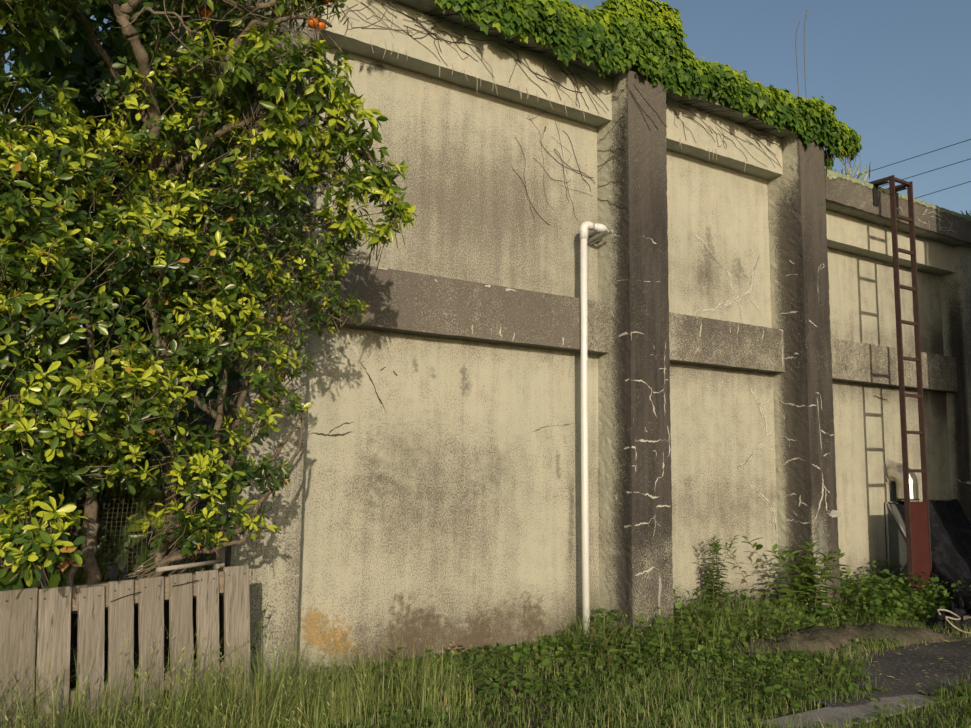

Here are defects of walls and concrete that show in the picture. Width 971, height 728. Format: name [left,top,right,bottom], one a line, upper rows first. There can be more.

crack [309,422,353,437]
crack [346,331,397,412]
crack [618,331,671,536]
crack [737,382,836,542]